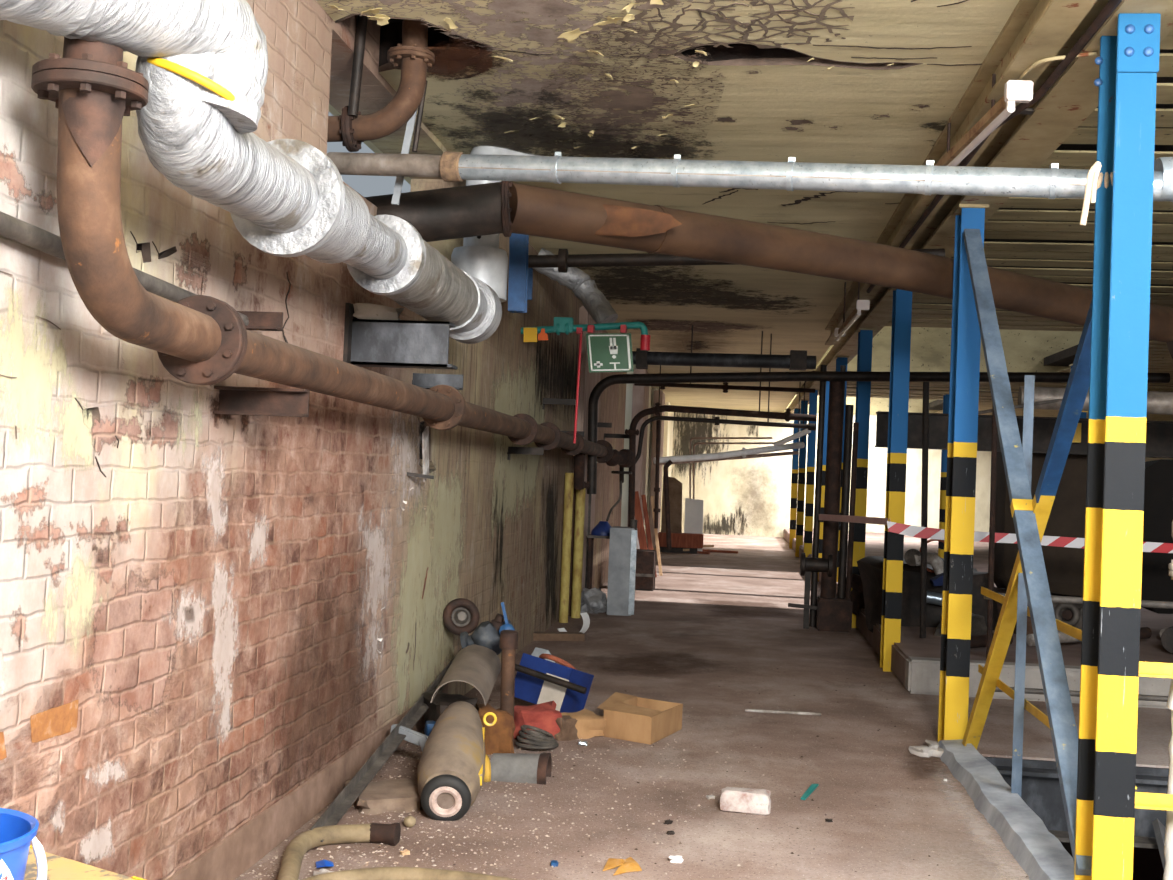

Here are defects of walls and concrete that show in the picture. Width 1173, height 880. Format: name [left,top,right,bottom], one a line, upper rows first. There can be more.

crack [620,0,982,70]
peeling [315,0,737,155]
leakage [424,89,712,159]
peeling [0,146,57,211]
peeling [130,231,210,295]
leakage [578,266,816,350]
peeling [75,375,179,455]
efflorescence [202,458,227,538]
efflorescence [248,515,266,561]
leakage [542,466,559,626]
peeling [1,479,178,715]
efflorescence [169,563,238,737]